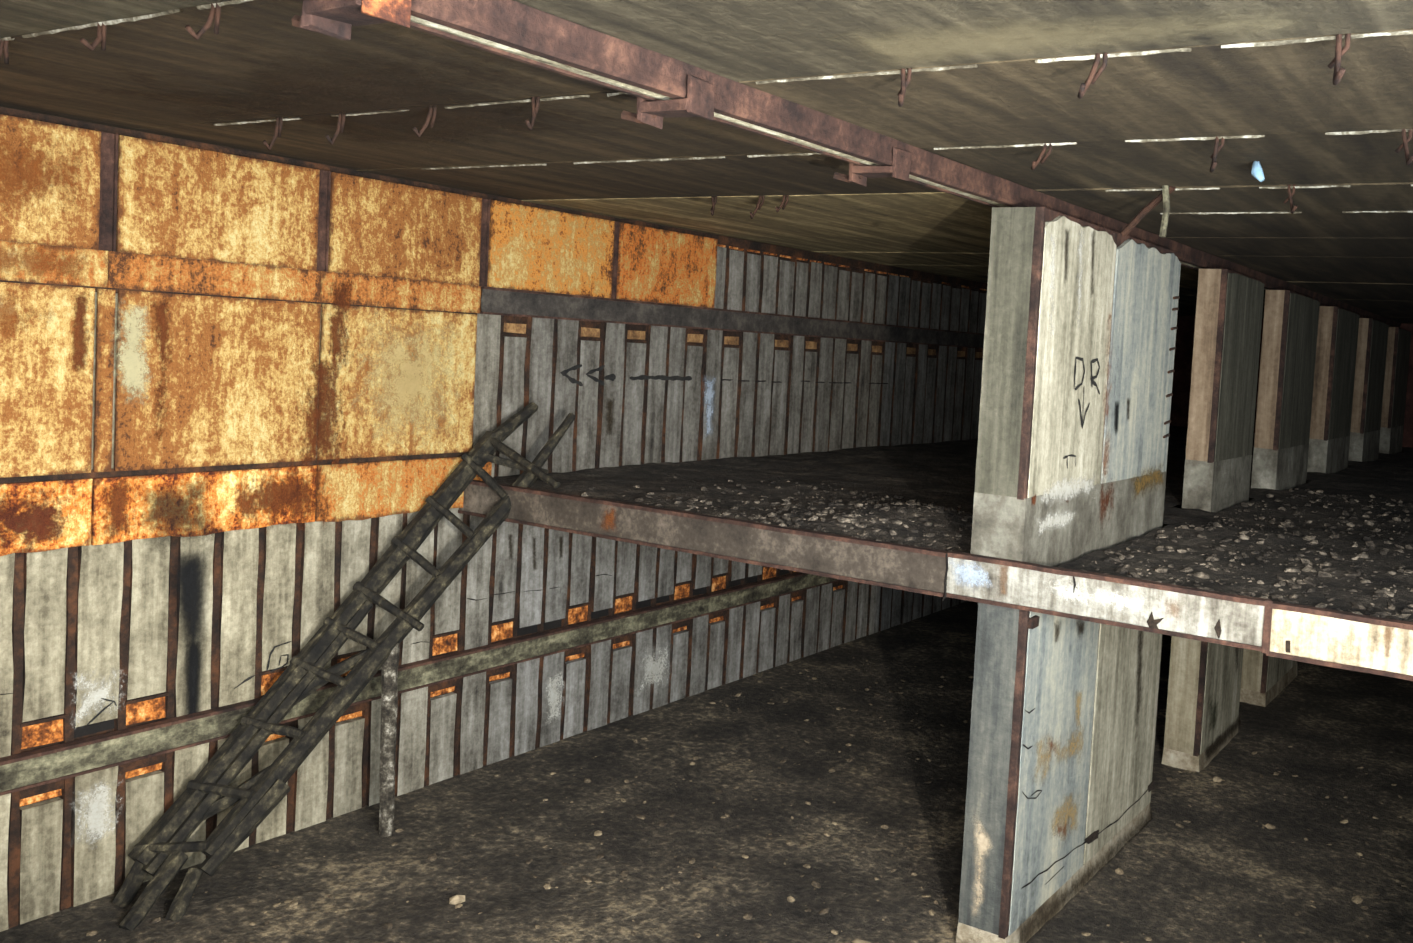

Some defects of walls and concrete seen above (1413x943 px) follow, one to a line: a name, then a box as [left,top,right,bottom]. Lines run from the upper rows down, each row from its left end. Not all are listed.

rust [0,114,718,556]
leakage [174,555,206,714]